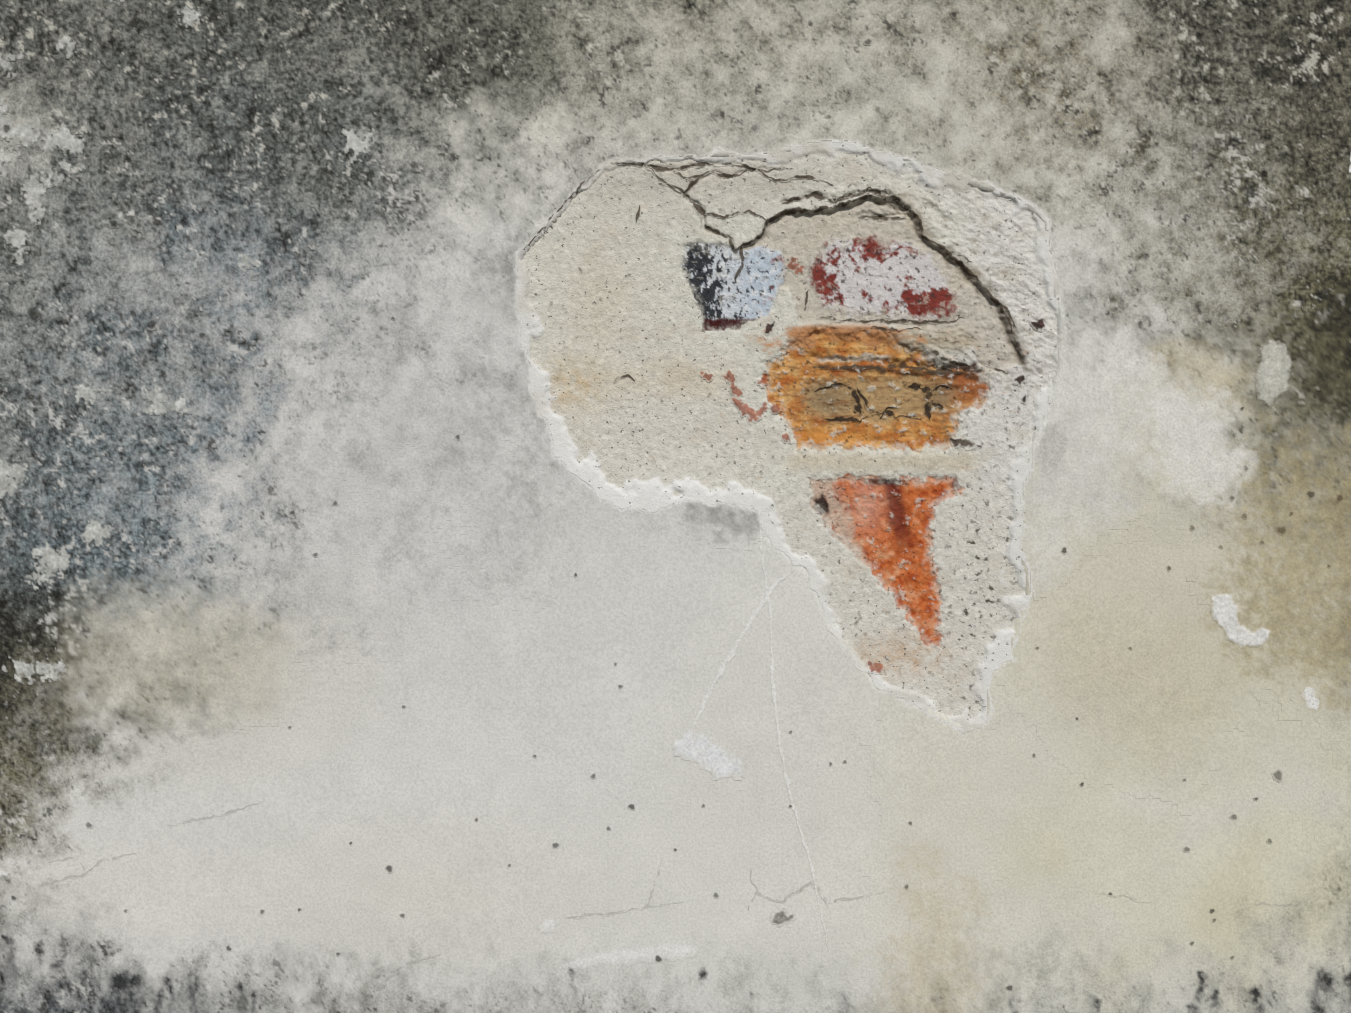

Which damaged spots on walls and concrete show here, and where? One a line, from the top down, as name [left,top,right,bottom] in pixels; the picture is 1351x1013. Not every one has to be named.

water stain [0,0,1351,763]
crack [524,161,1026,450]
flaking render [516,141,1065,734]
water stain [994,303,1351,1013]
water stain [0,885,864,1013]
crack [563,857,685,919]
crack [748,866,885,911]